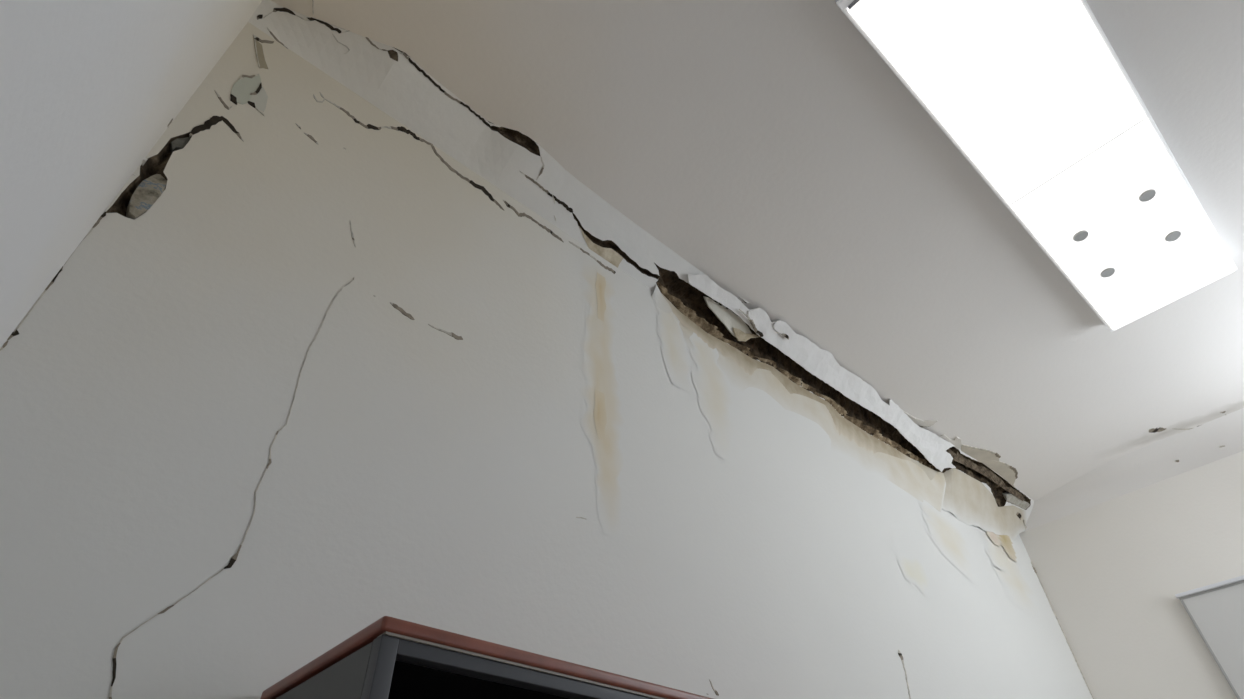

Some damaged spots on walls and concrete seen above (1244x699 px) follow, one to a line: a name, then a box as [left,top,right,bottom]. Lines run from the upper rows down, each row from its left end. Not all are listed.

crack [0,212,106,351]
spalling [106,34,274,220]
crack [109,278,463,699]
water stain [577,251,625,539]
peeling [572,213,1030,529]
water stain [651,285,1042,622]